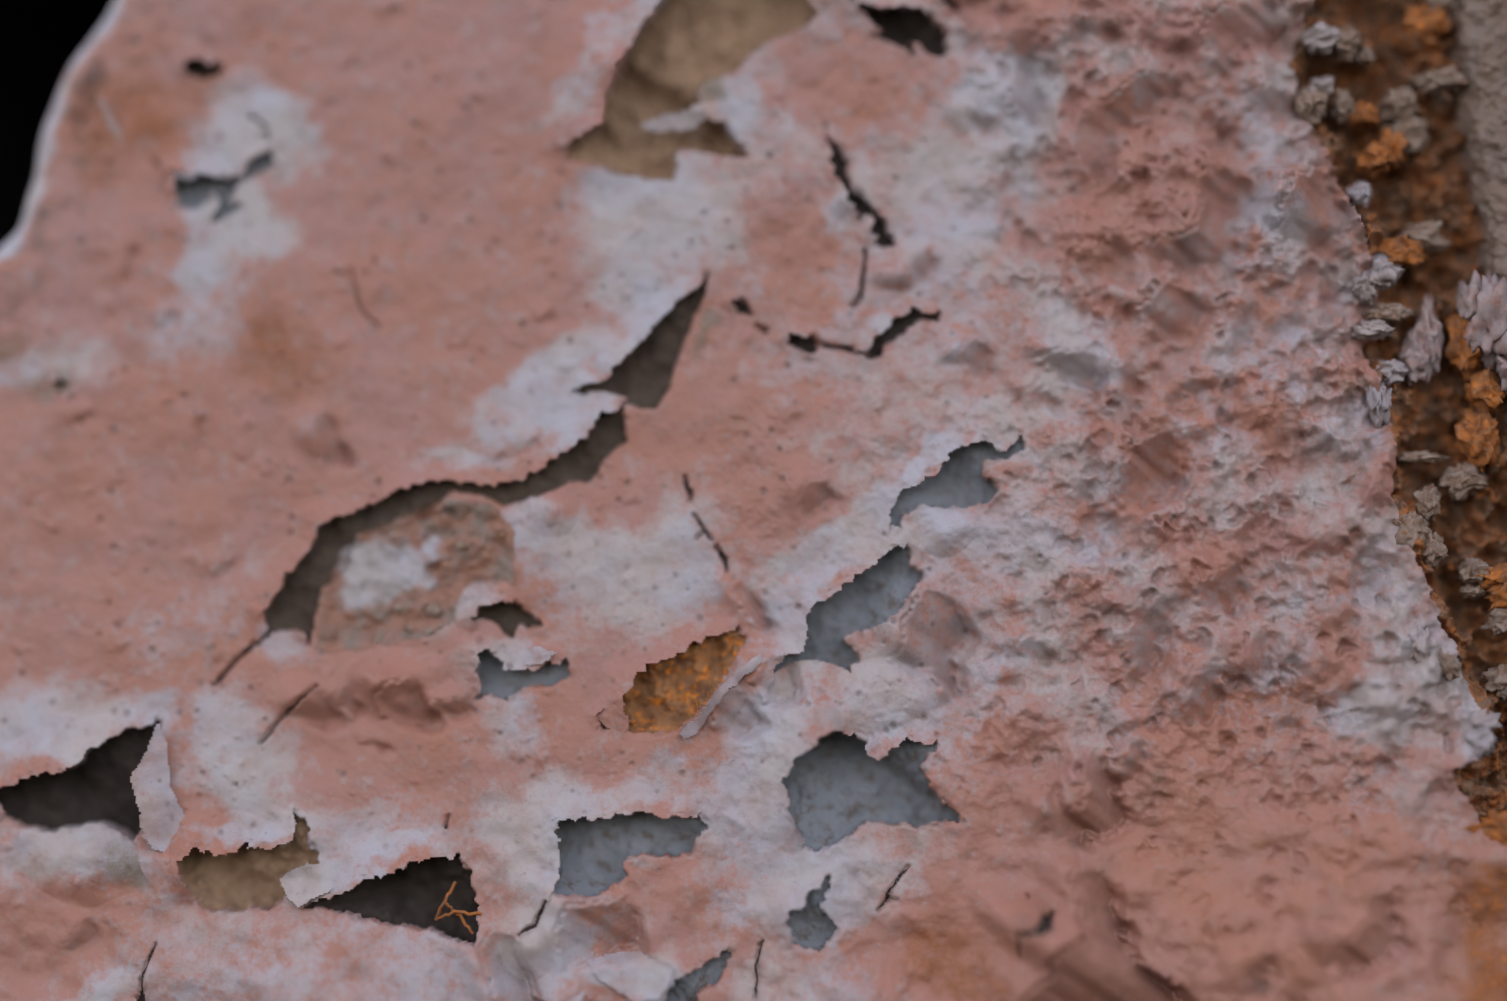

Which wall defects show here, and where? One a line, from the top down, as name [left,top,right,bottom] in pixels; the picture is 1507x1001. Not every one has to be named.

crack [943,0,957,11]
peeling [534,0,946,181]
peeling [154,137,273,224]
crack [854,247,867,308]
peeling [767,316,818,354]
crack [818,344,864,354]
peeling [239,271,753,702]
peeling [584,421,1024,854]
peeling [0,708,482,943]
peeling [513,771,707,901]
peeling [753,871,837,952]
peeling [1020,898,1054,938]